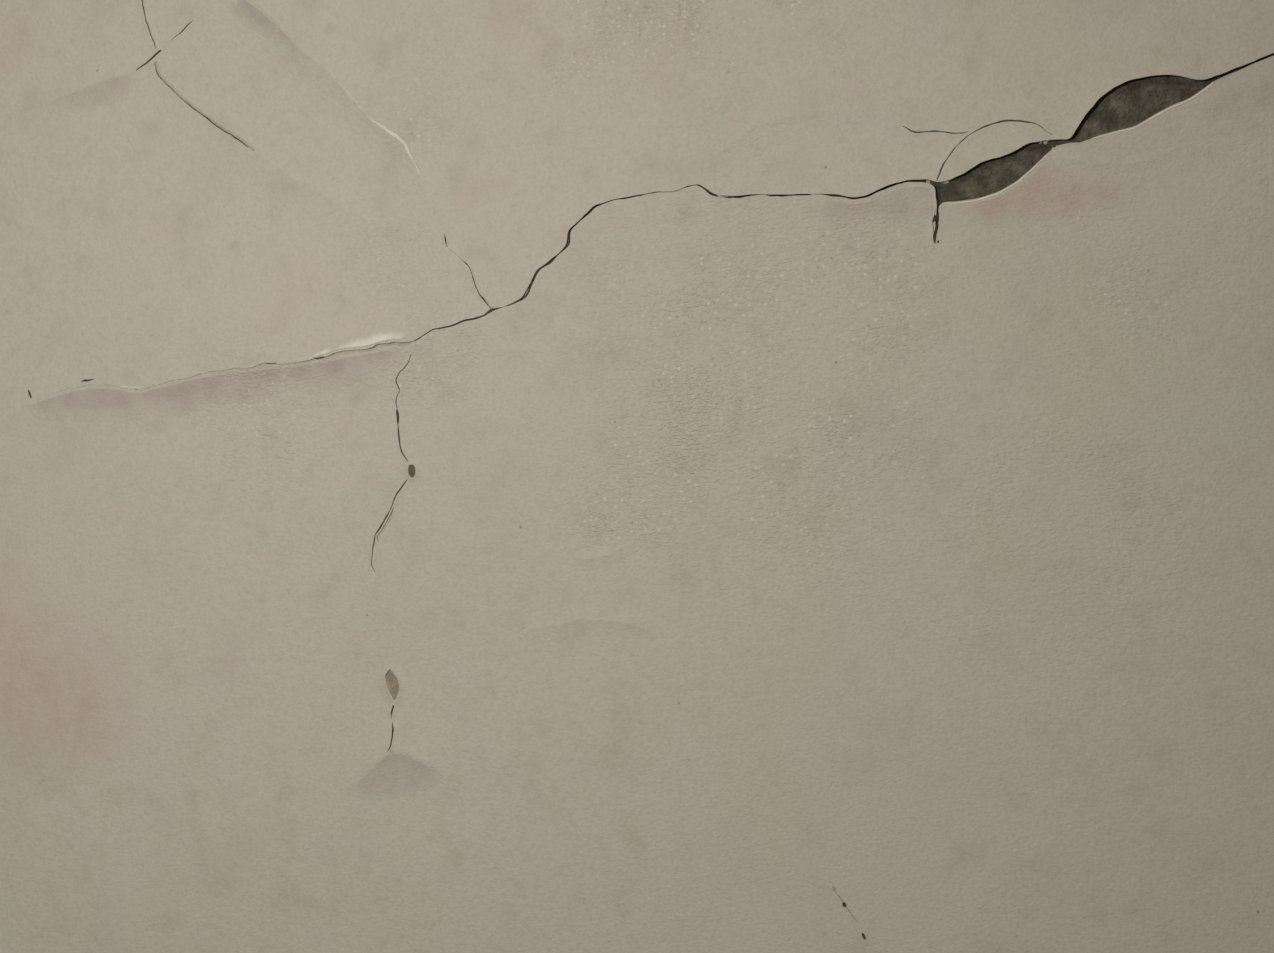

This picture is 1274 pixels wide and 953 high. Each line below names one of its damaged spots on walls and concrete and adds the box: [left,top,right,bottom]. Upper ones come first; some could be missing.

crack [134,0,194,75]
crack [935,115,1053,184]
peeling [0,0,1274,438]
crack [81,375,95,383]
crack [367,354,421,572]